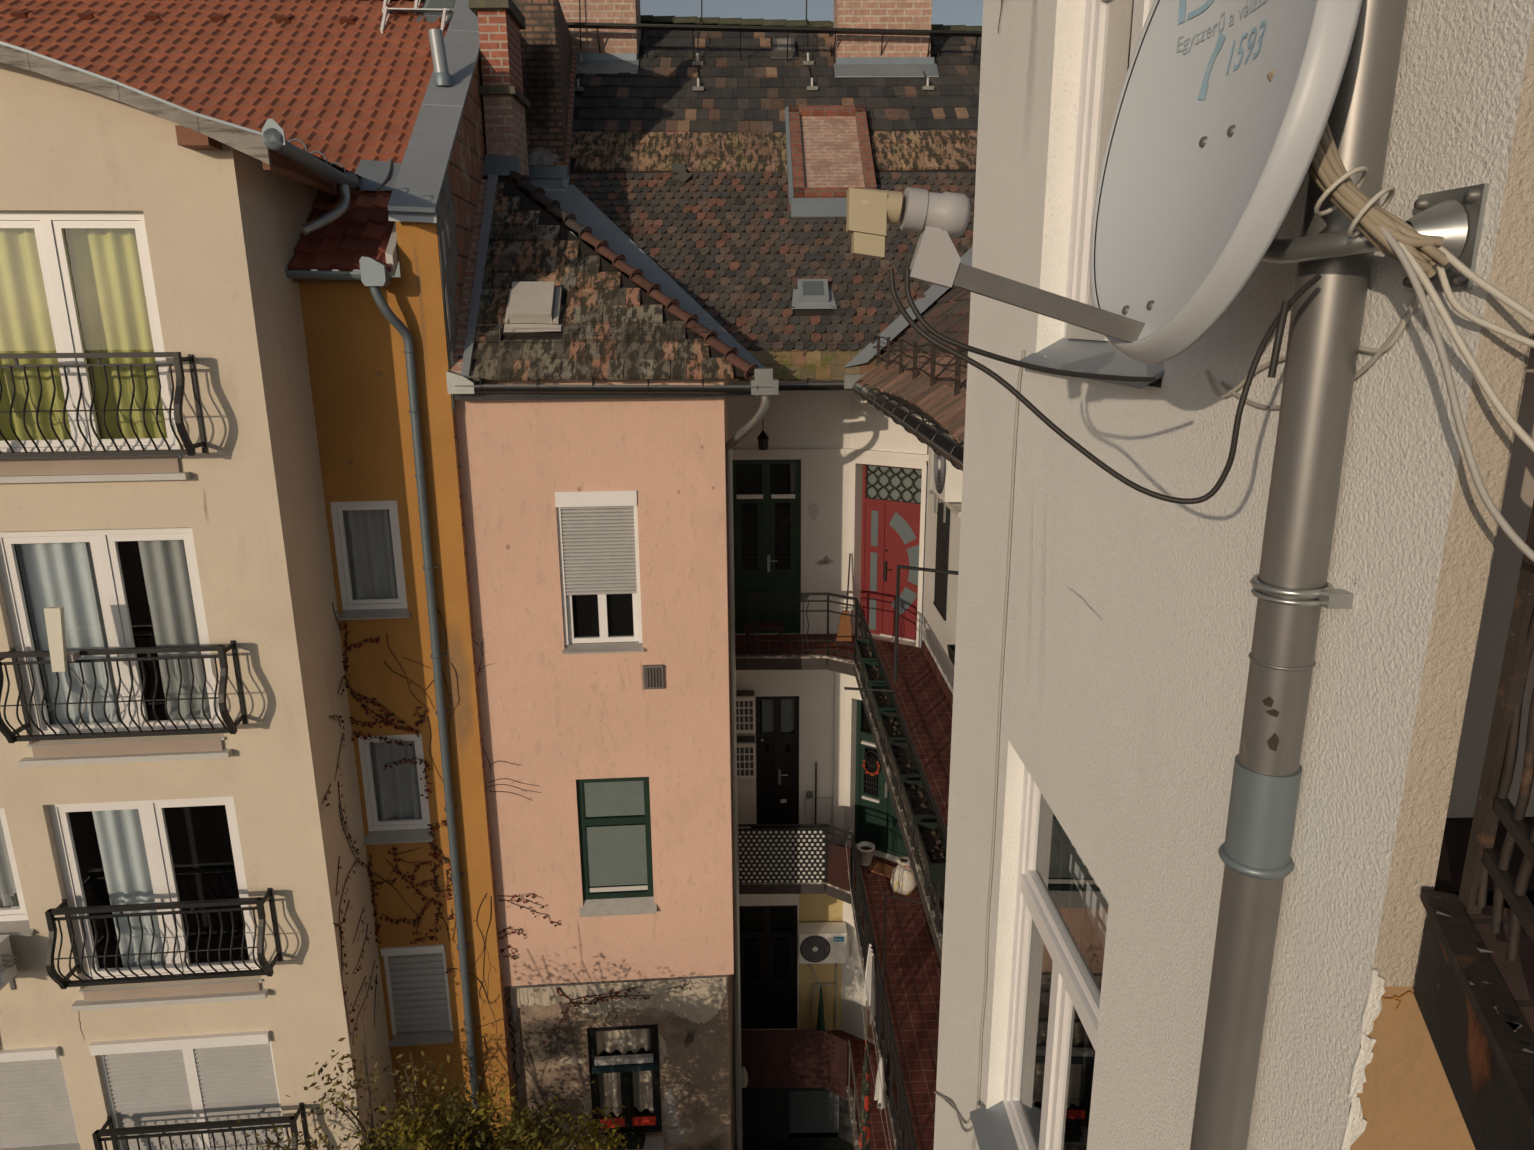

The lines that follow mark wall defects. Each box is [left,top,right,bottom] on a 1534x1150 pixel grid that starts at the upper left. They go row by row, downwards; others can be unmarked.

damp [525,1023,575,1061]
peeling [510,977,727,1045]
peeling [1341,969,1385,1150]
corrosion [1465,994,1490,1085]
peeling [662,1087,691,1144]